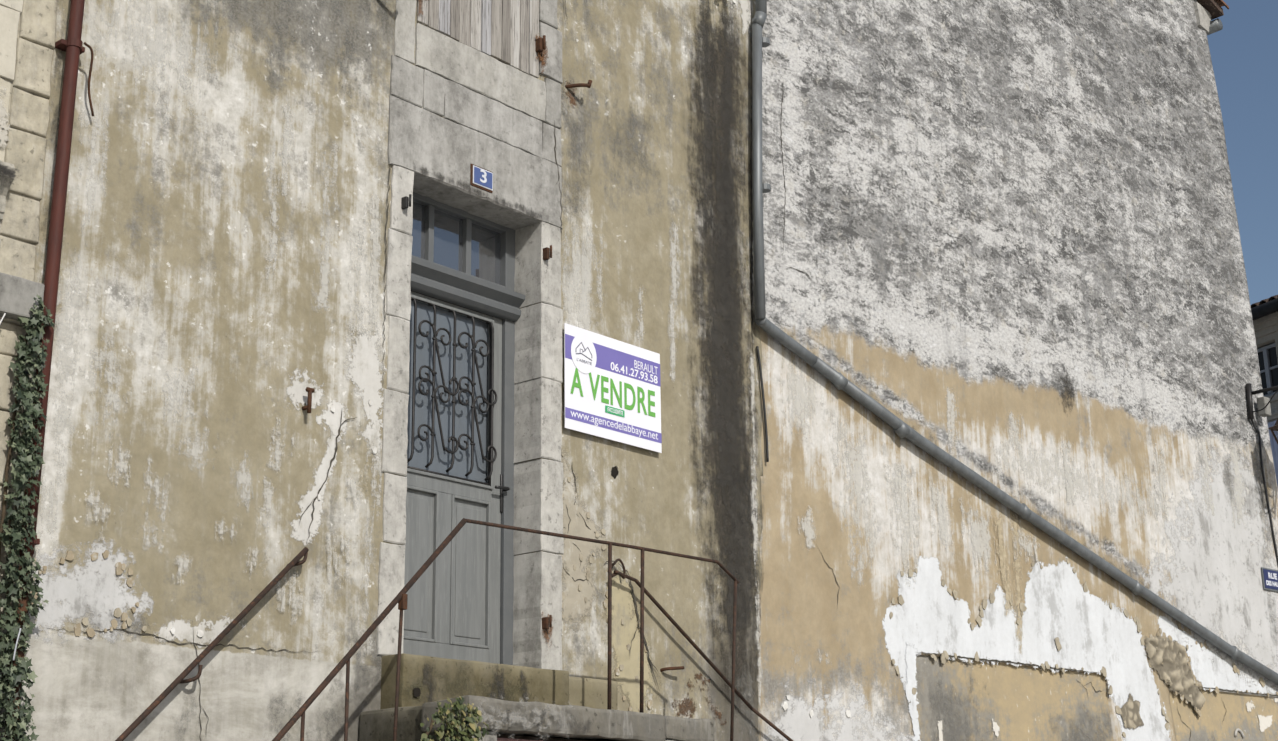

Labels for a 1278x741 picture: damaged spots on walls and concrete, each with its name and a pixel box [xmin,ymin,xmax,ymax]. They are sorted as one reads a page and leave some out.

corrosion [536,35,548,73]
water stain [314,143,339,308]
water stain [561,90,602,330]
flaking render [108,441,130,484]
flaking render [28,458,234,648]
flaking render [236,419,294,525]
flaking render [277,572,303,621]
crack [299,413,357,543]
water stain [669,0,915,741]
water stain [1060,375,1075,406]
flaking render [882,514,1278,741]
water stain [996,414,1278,699]